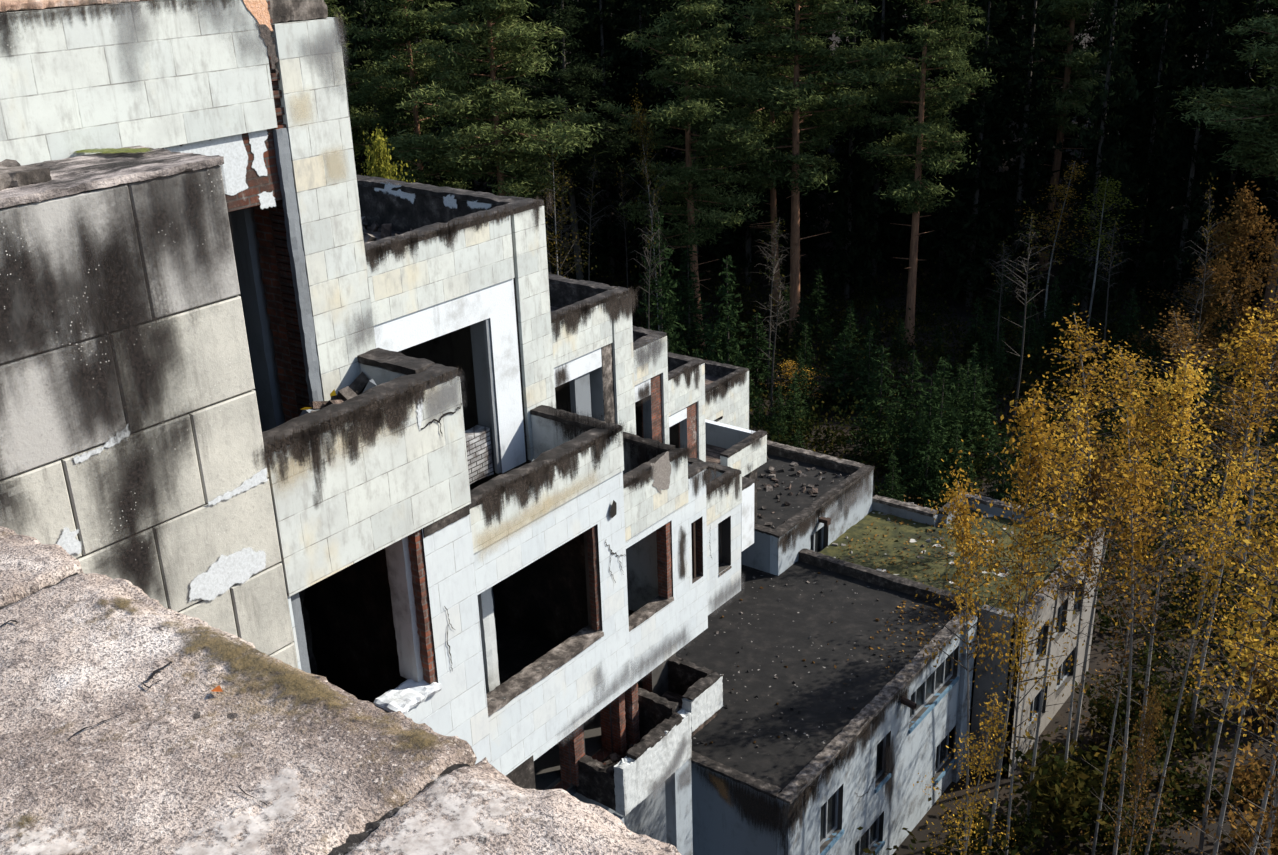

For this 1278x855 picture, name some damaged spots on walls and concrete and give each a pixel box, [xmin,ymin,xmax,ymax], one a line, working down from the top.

peeling [164,129,276,209]
water stain [366,193,553,271]
water stain [0,165,228,597]
water stain [674,363,747,404]
water stain [254,368,460,506]
crack [421,403,462,434]
water stain [477,402,698,524]
water stain [692,465,751,501]
peeling [57,526,82,554]
peeling [189,547,267,602]
crack [605,541,627,583]
crack [445,607,455,671]